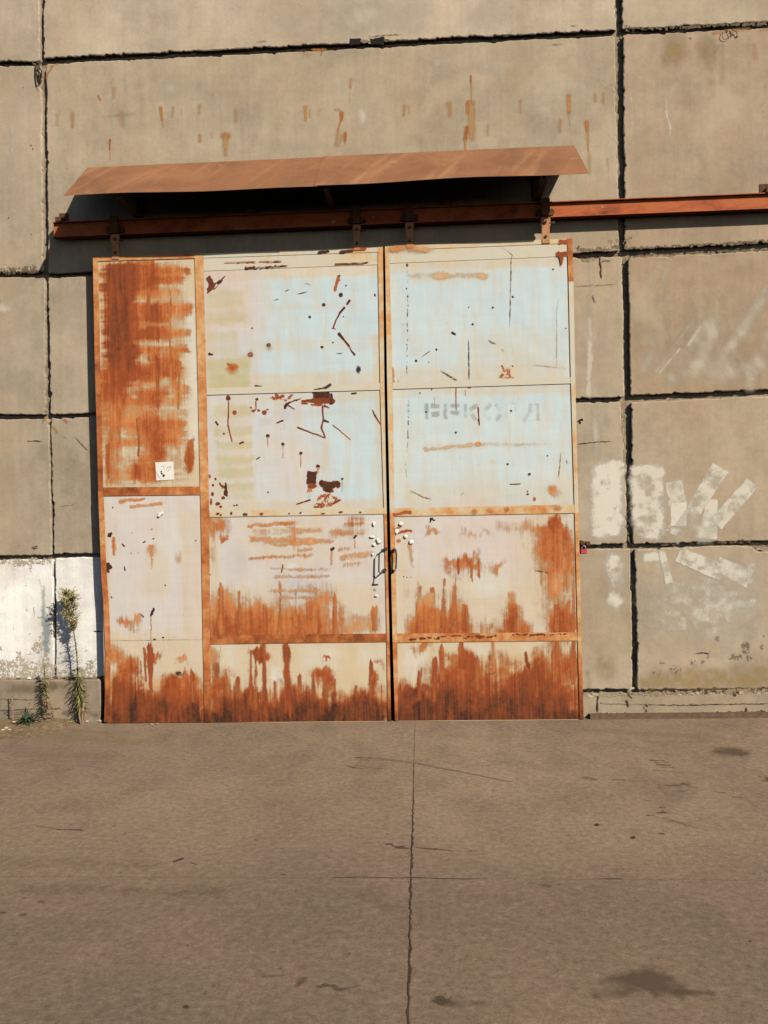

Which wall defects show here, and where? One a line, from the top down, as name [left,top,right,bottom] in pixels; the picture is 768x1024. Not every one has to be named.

rust [464,75,475,150]
rust [99,260,194,485]
rust [215,395,244,444]
rust [297,405,351,440]
rust [104,486,580,723]
crack [377,793,476,1024]